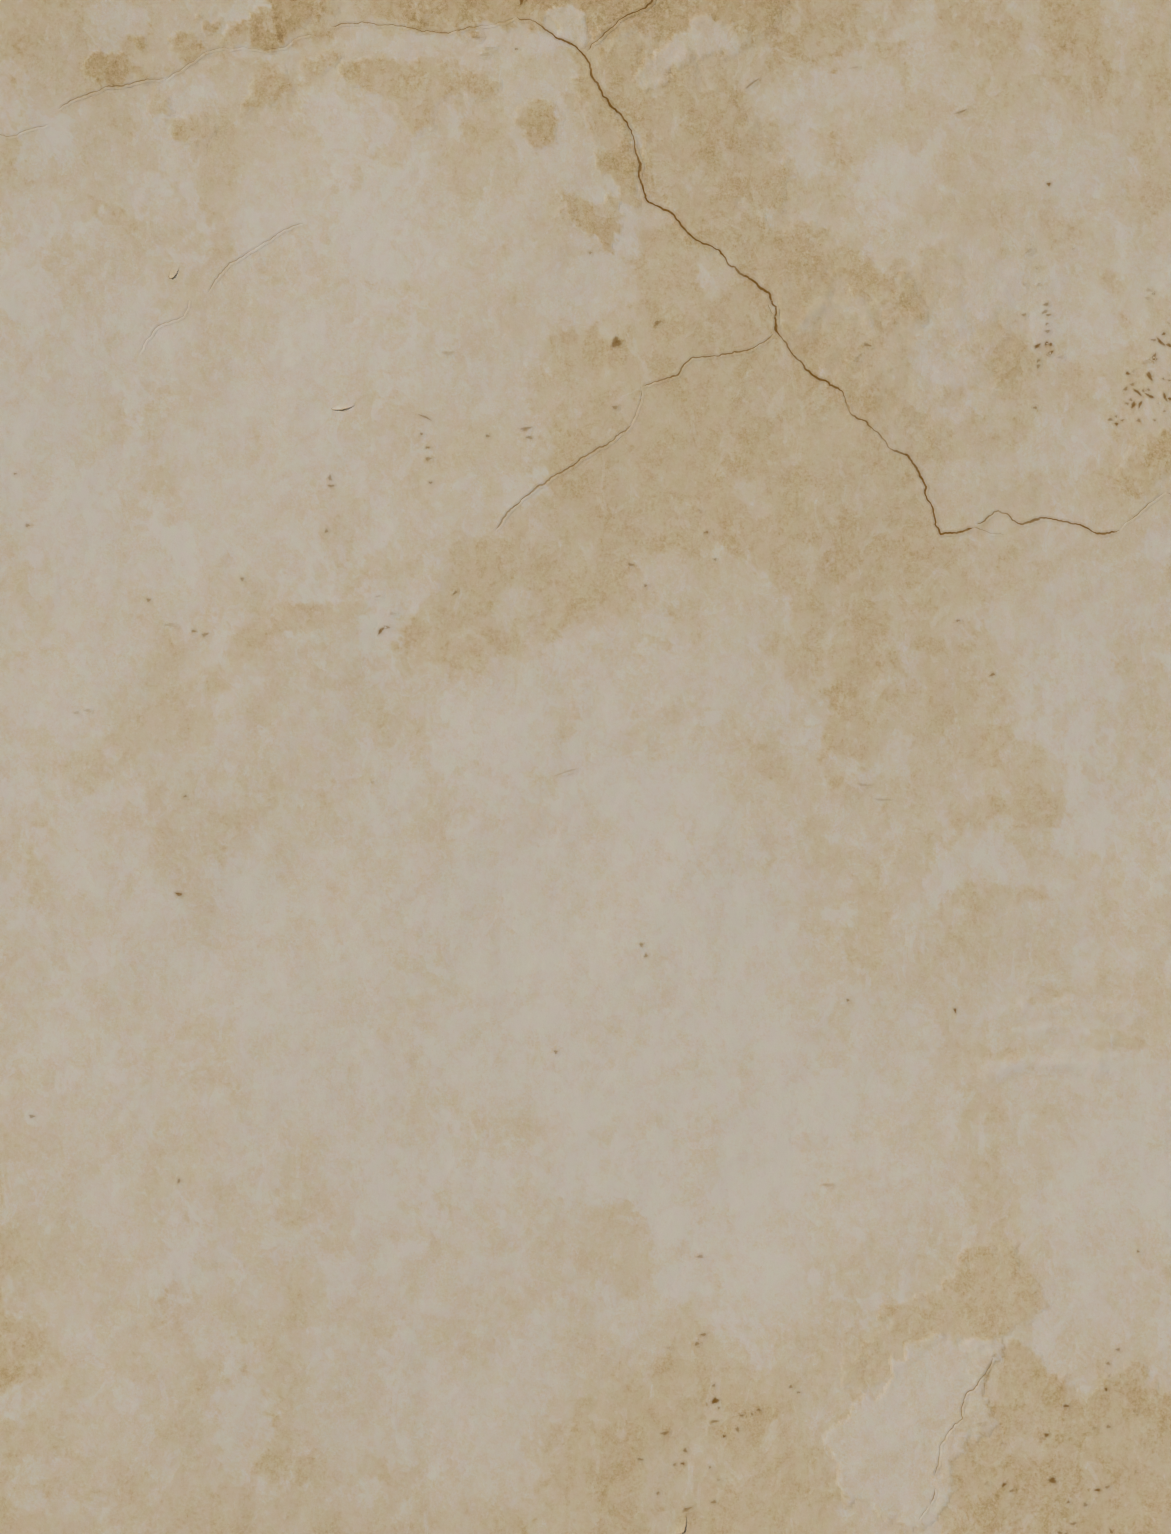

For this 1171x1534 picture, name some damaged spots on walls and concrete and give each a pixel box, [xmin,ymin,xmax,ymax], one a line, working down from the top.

crack [0,0,1171,538]